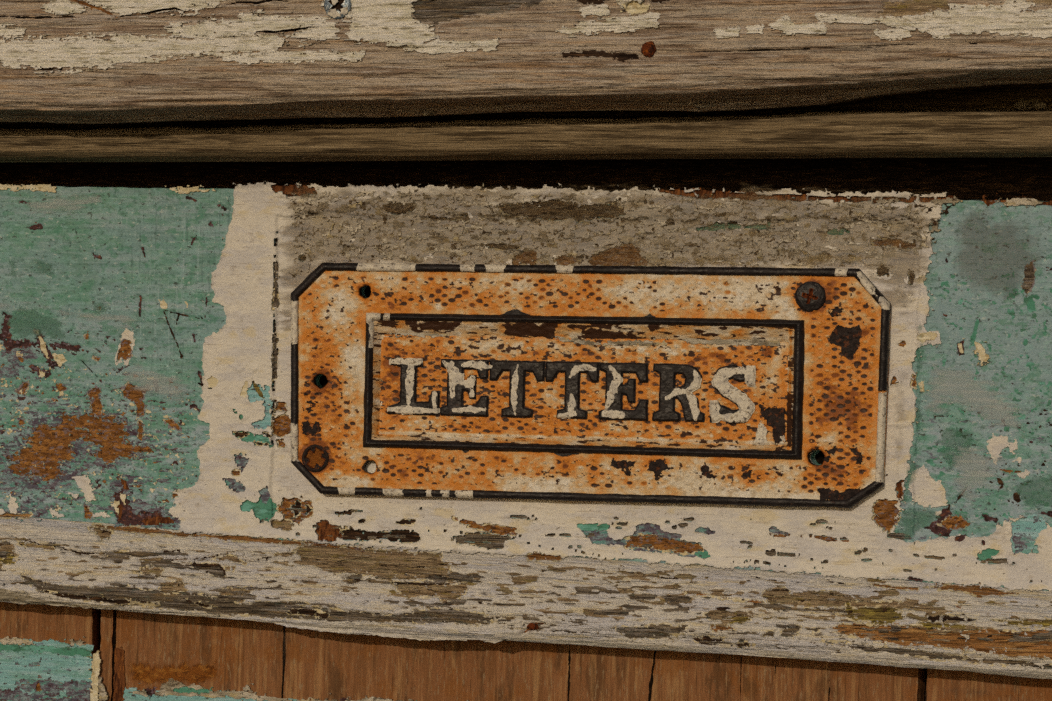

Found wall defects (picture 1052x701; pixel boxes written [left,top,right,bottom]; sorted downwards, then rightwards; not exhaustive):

peeling [0,0,555,76]
peeling [562,50,639,64]
peeling [713,0,1052,41]
peeling [0,184,57,204]
peeling [891,258,1052,564]
corrosion [307,449,324,468]
peeling [0,306,1052,670]
crack [0,507,1052,645]
crack [109,614,117,701]
peeling [0,636,417,701]
crack [279,626,287,698]
crack [565,644,573,701]